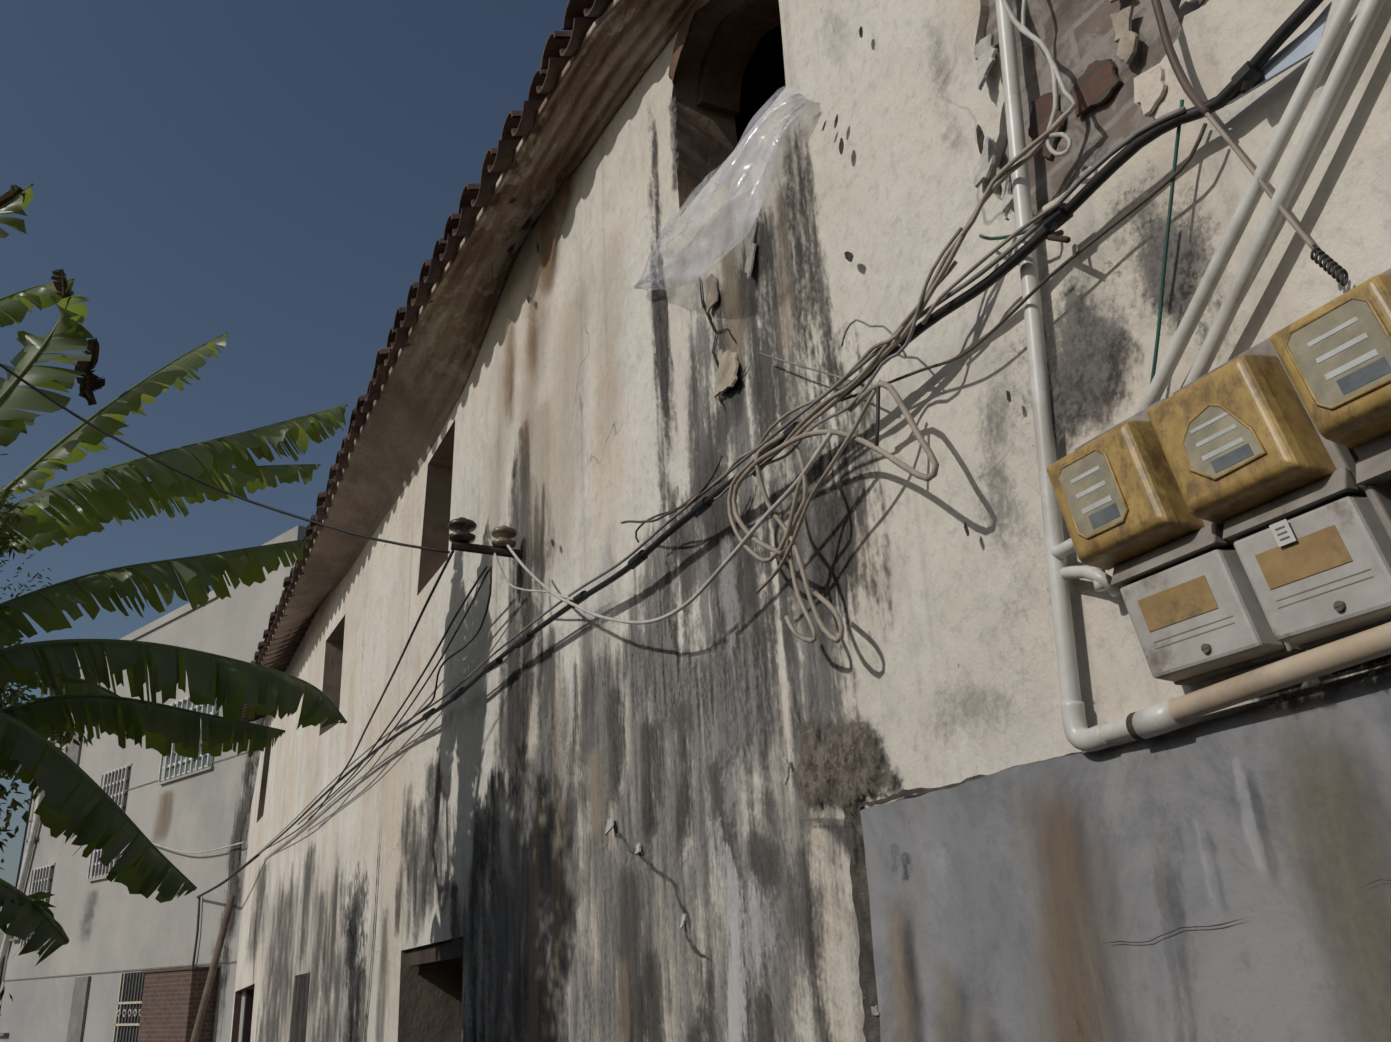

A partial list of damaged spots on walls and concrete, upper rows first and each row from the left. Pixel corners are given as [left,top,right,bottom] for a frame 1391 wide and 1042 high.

spalling [973,0,1206,221]
damp [211,97,891,1042]
crack [1102,918,1244,944]